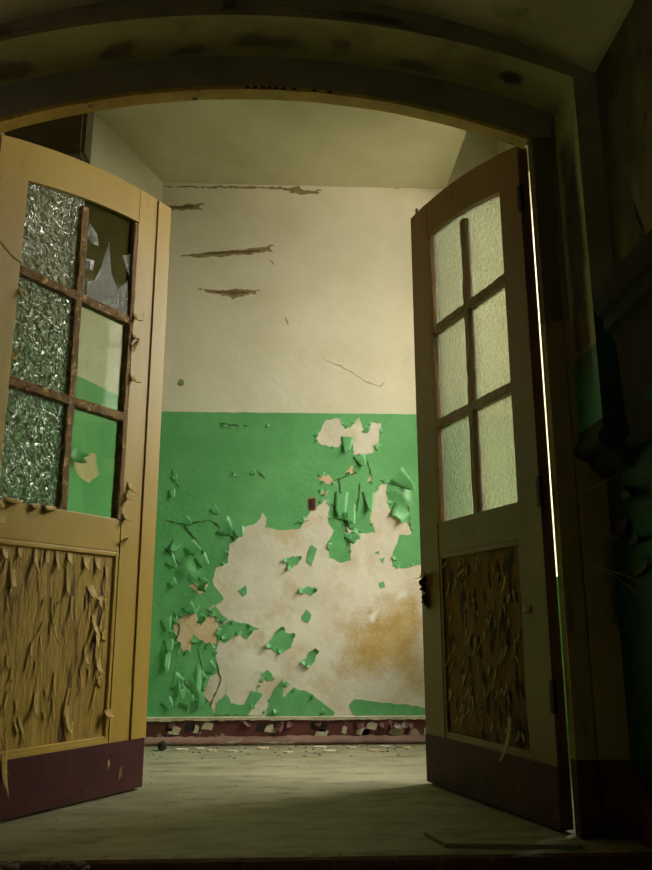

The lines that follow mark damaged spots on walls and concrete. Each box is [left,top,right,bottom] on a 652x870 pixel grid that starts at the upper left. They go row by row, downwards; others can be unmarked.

spalling [182,245,274,258]
spalling [197,288,260,299]
crack [324,359,386,387]
peeling [160,418,531,763]
water stain [323,578,425,698]